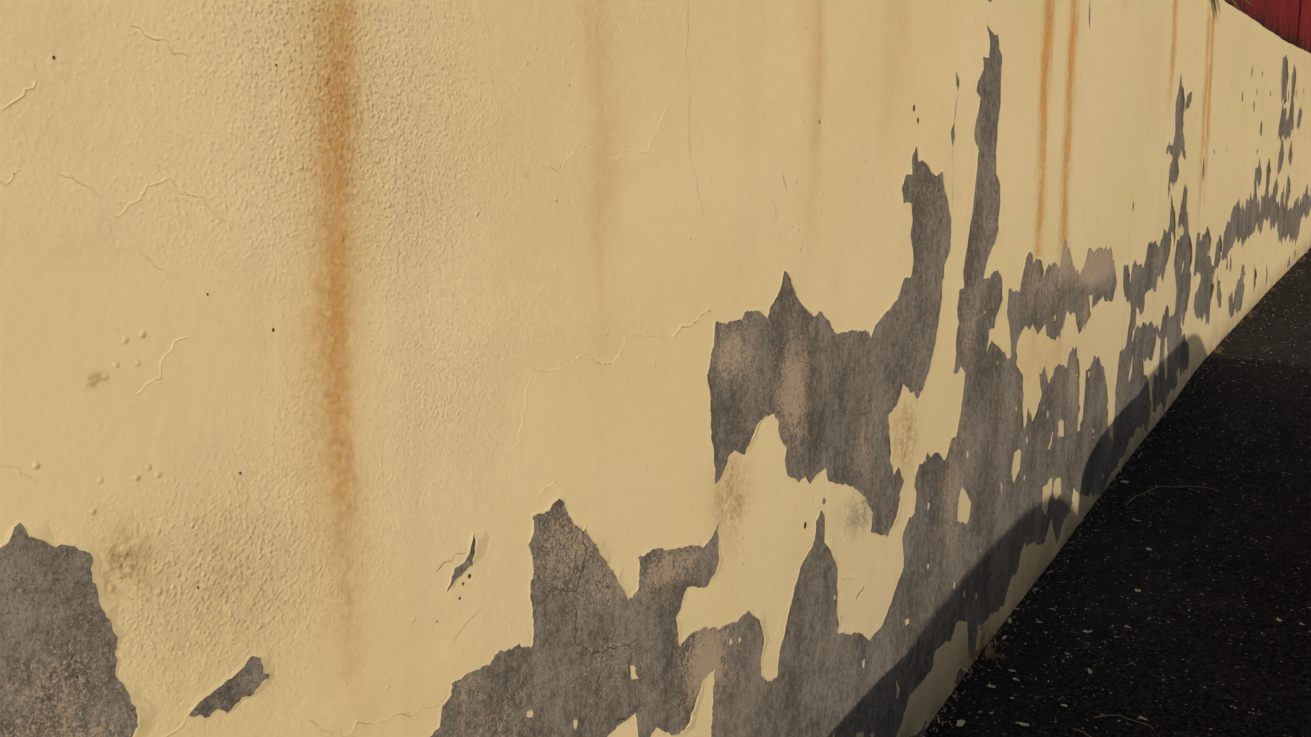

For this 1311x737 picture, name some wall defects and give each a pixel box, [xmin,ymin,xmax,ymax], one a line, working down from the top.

crack [1,81,37,110]
crack [59,172,227,222]
rust [1036,0,1053,256]
rust [1062,0,1077,243]
crack [510,308,711,451]
peeling [423,24,1311,737]
peeling [0,517,158,737]
peeling [186,650,275,721]